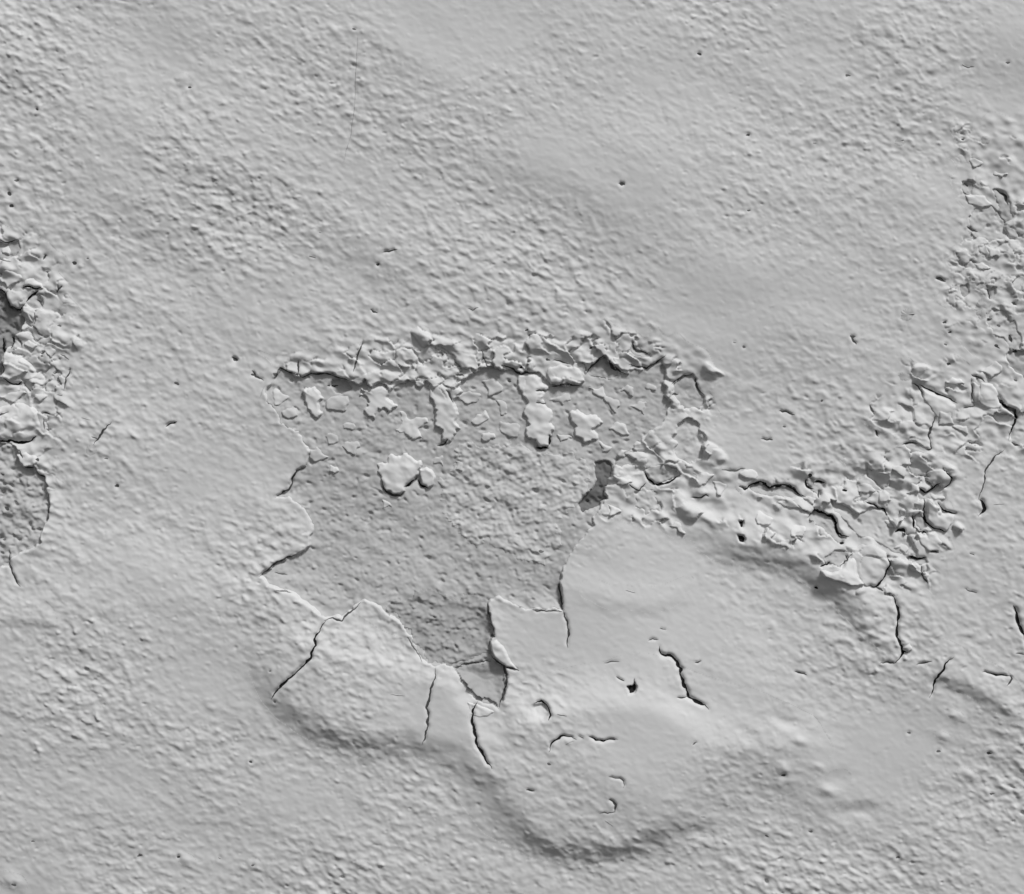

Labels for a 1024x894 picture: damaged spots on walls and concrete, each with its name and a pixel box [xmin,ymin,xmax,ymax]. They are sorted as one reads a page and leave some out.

spalling [0,208,85,566]
spalling [258,109,1024,717]
crack [865,375,1024,698]
crack [271,603,360,699]
crack [393,604,518,767]
crack [535,700,615,752]
crack [649,628,709,709]